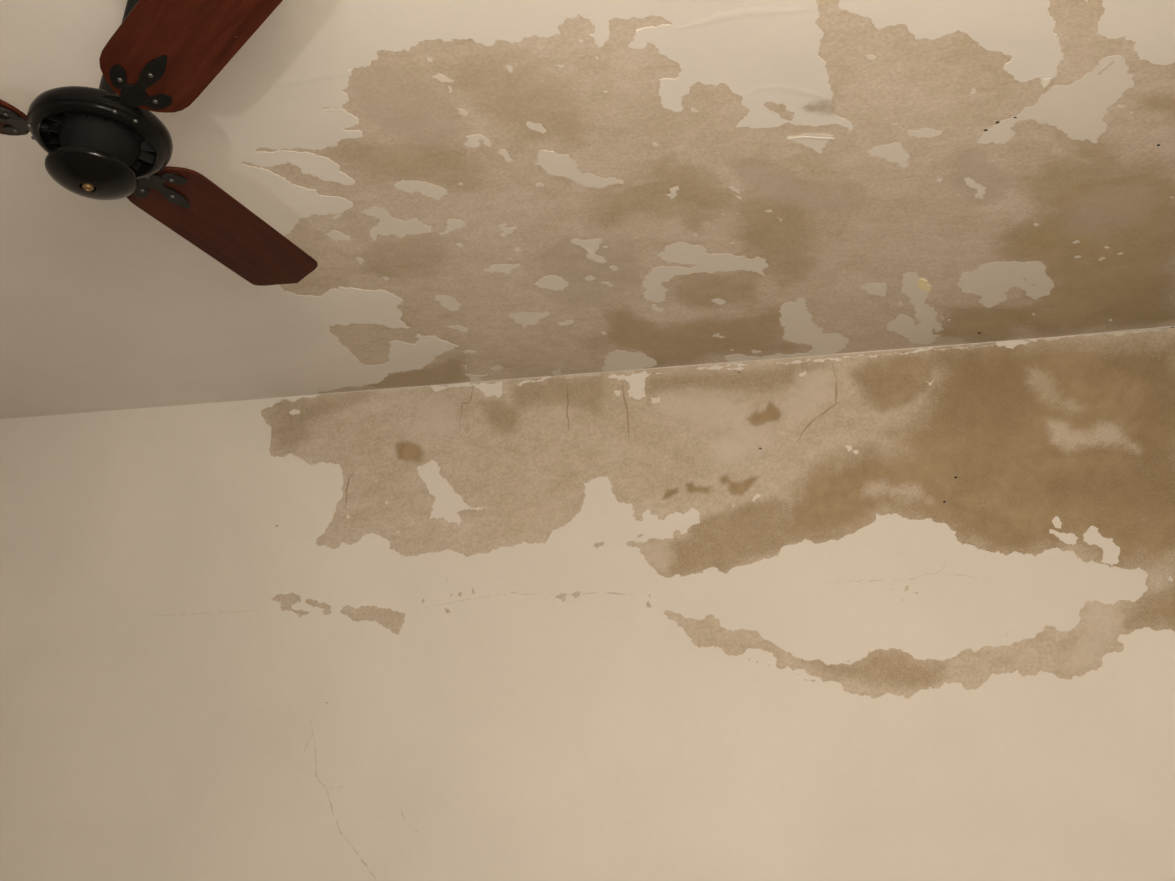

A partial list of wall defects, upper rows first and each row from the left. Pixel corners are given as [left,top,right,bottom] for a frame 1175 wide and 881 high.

peeling [241,0,1175,699]
leakage [268,354,475,455]
crack [617,383,629,434]
crack [798,363,837,440]
leakage [535,124,1175,676]
leakage [395,438,425,466]
leakage [795,649,950,695]